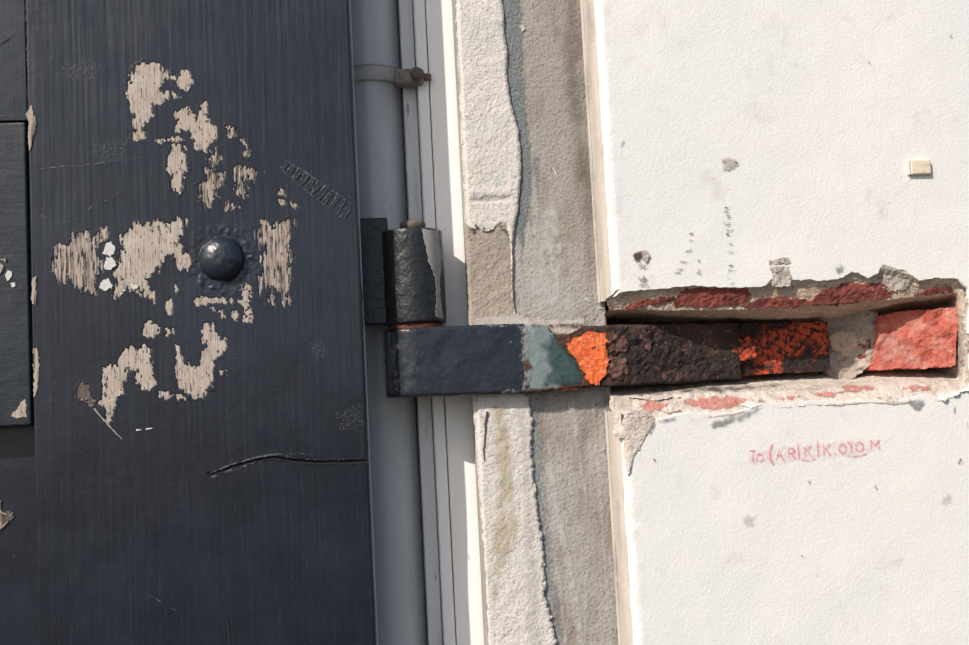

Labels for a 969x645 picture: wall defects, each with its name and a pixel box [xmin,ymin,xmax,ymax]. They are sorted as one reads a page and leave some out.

peeling [125,62,255,211]
leakage [502,0,539,253]
peeling [52,216,191,315]
peeling [74,189,300,439]
flaking render [465,224,514,326]
leakage [531,208,561,312]
rust [527,324,652,392]
spalling [584,257,969,474]
peeling [0,500,15,532]